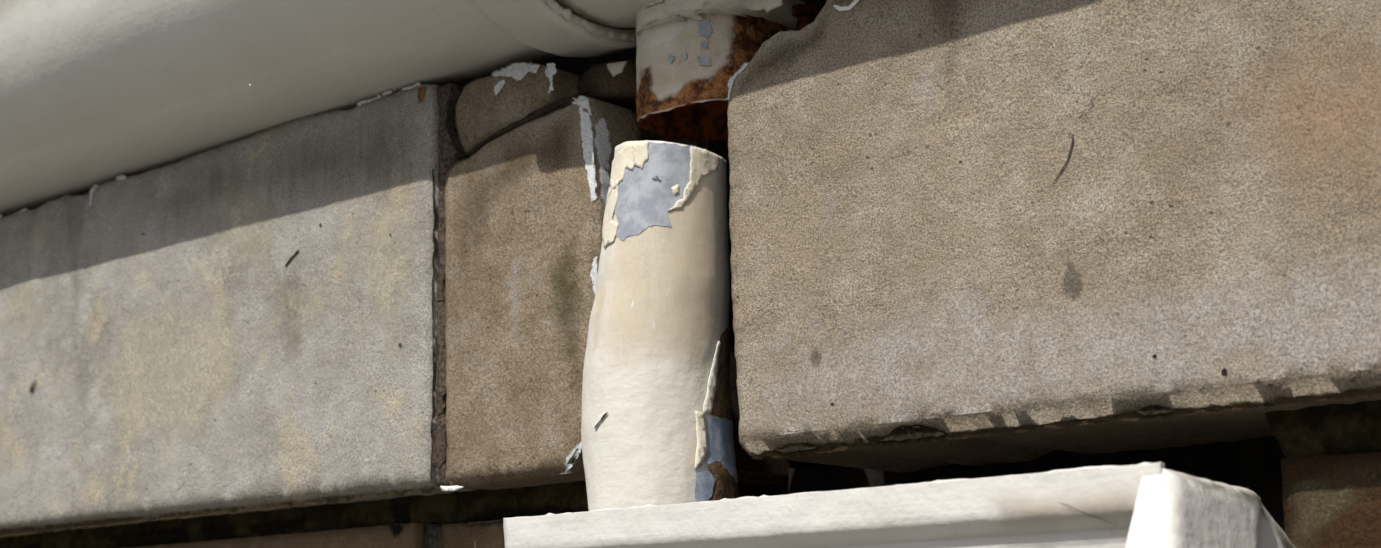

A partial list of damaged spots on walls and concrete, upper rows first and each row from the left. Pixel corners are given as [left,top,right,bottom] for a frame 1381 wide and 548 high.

peeling [492,62,557,95]
rust [635,14,788,133]
peeling [572,96,720,294]
crack [1049,132,1074,189]
peeling [694,327,739,502]